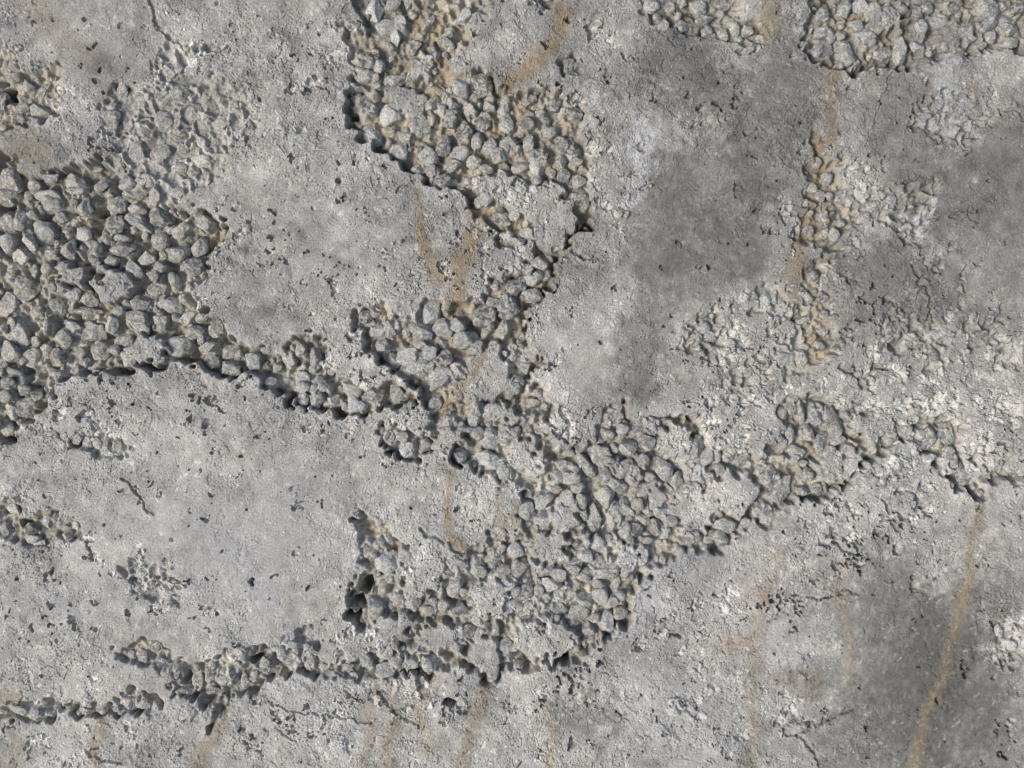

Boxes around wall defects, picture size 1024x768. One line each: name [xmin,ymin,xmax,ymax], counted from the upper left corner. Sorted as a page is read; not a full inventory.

spalling [0,51,63,131]
peeling [54,261,140,311]
peeling [123,324,173,377]
peeling [425,426,475,454]
peeling [493,401,556,479]
peeling [653,419,695,460]
peeling [808,411,999,491]
peeling [526,500,604,572]
peeling [605,534,652,575]
peeling [642,466,761,538]
peeling [357,570,581,680]
rust [911,507,983,768]